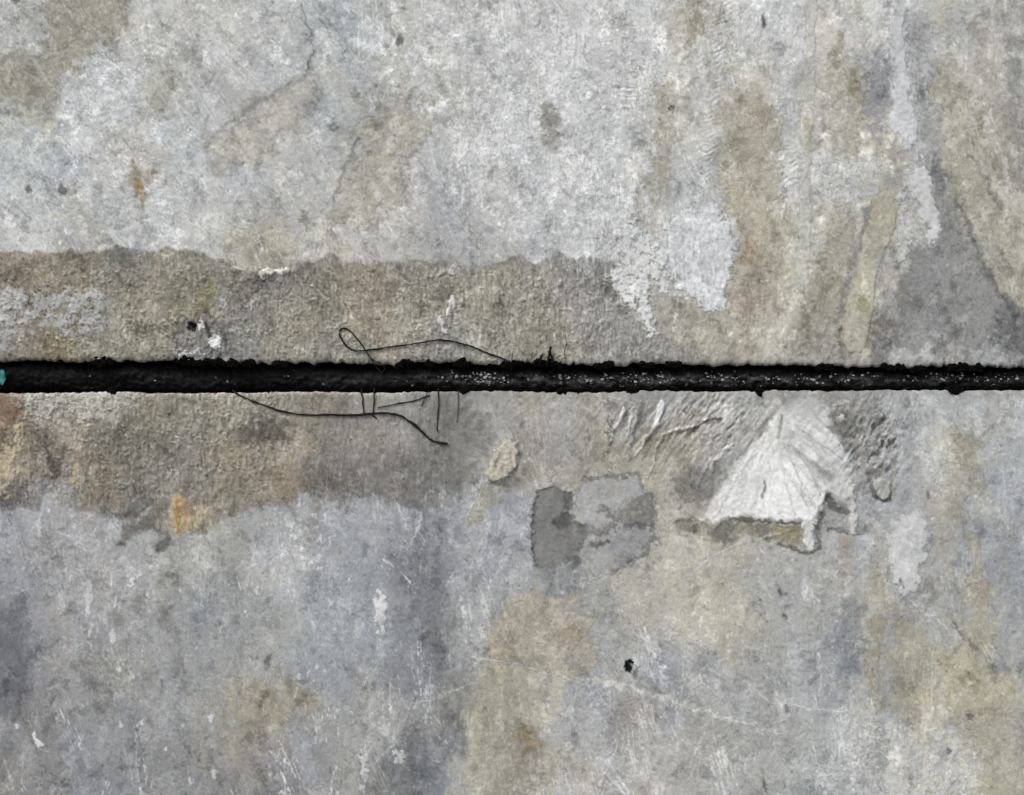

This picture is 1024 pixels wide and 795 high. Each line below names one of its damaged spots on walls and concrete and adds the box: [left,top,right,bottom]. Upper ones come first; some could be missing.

water stain [0,0,703,367]
water stain [0,391,485,660]
flaking render [531,473,658,577]
spalling [676,395,897,574]